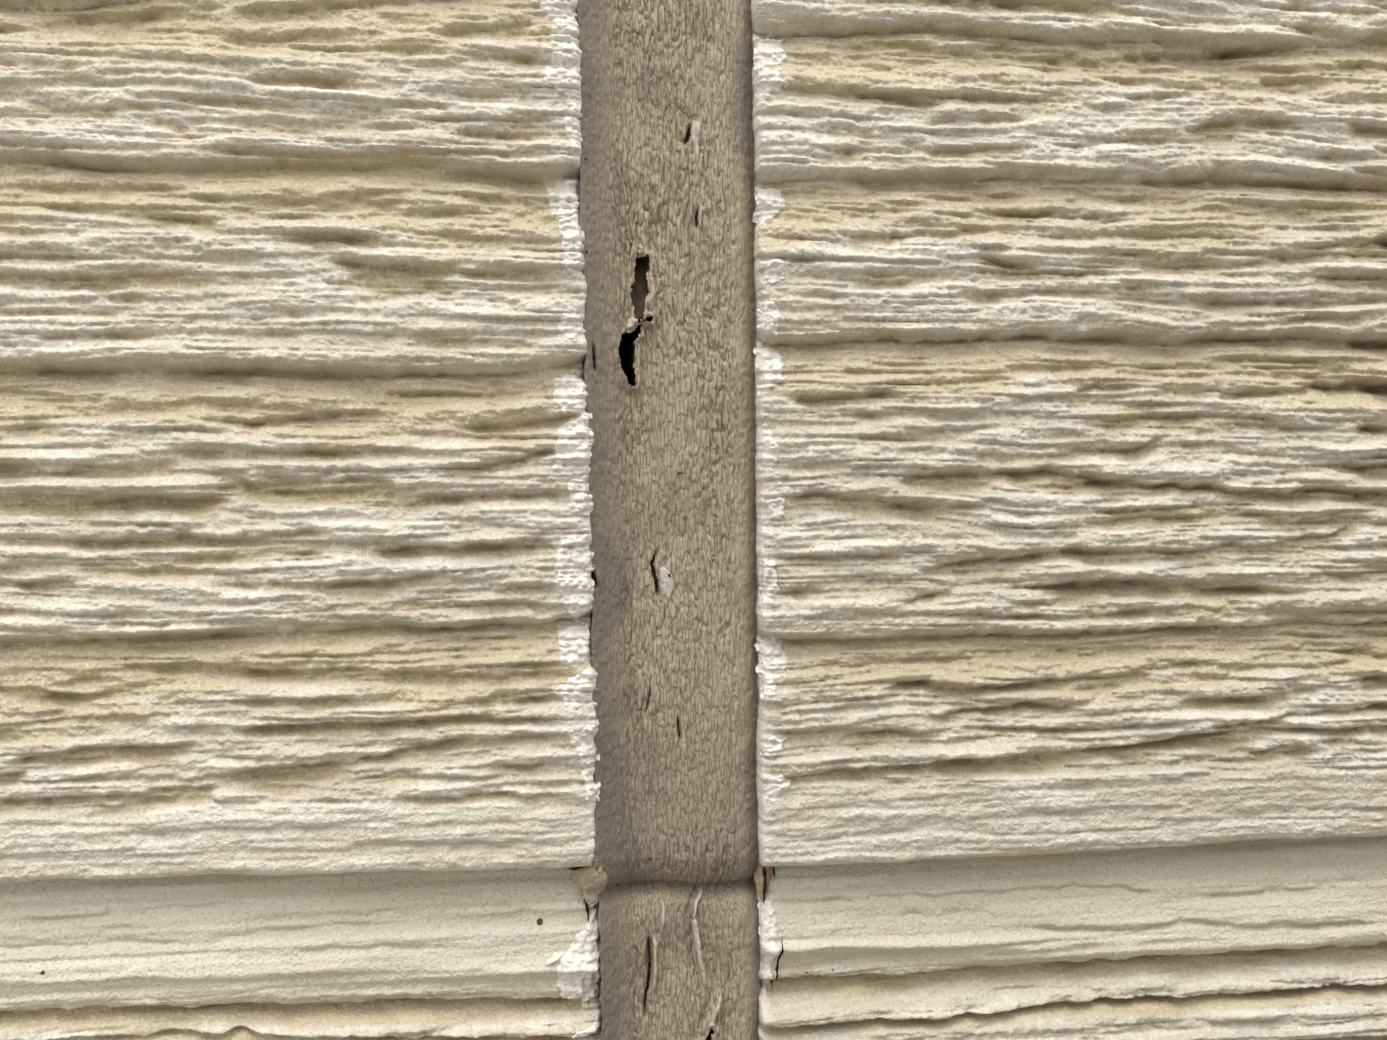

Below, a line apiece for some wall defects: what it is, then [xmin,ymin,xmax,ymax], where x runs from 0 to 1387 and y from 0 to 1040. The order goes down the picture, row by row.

crack [592,244,655,401]
crack [644,934,658,1013]
crack [706,995,722,1040]